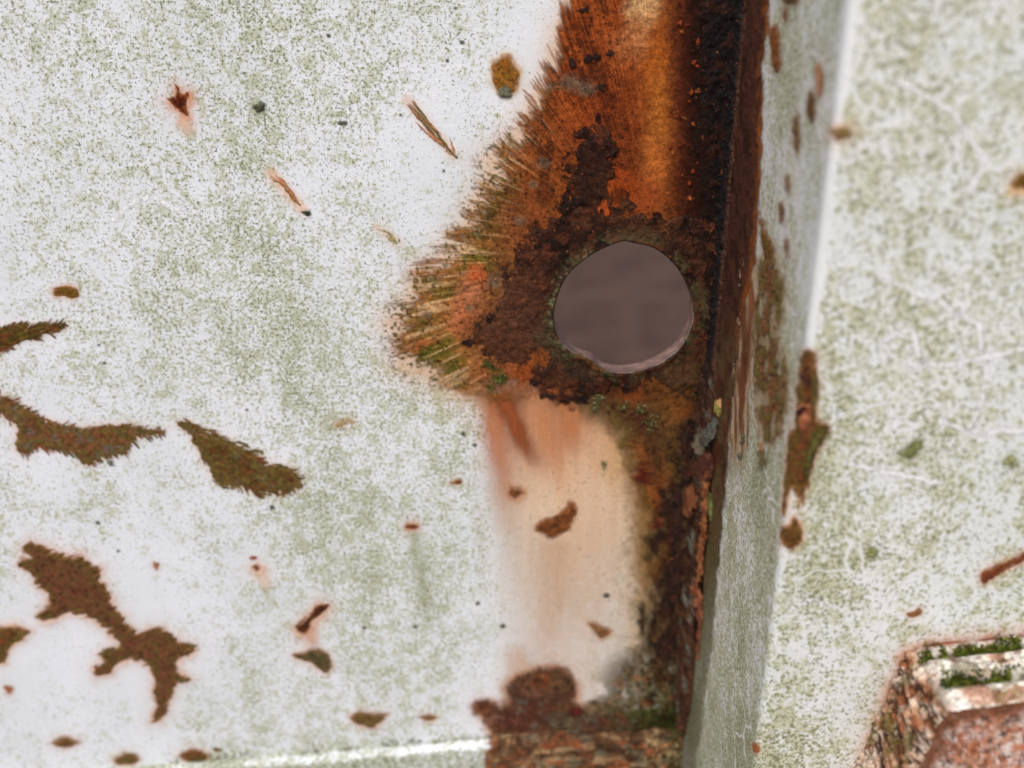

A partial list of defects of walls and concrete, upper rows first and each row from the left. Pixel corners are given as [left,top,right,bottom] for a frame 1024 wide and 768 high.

rust [168,85,192,129]
rust [271,176,301,205]
rust [383,0,830,725]
rust [979,552,1024,584]